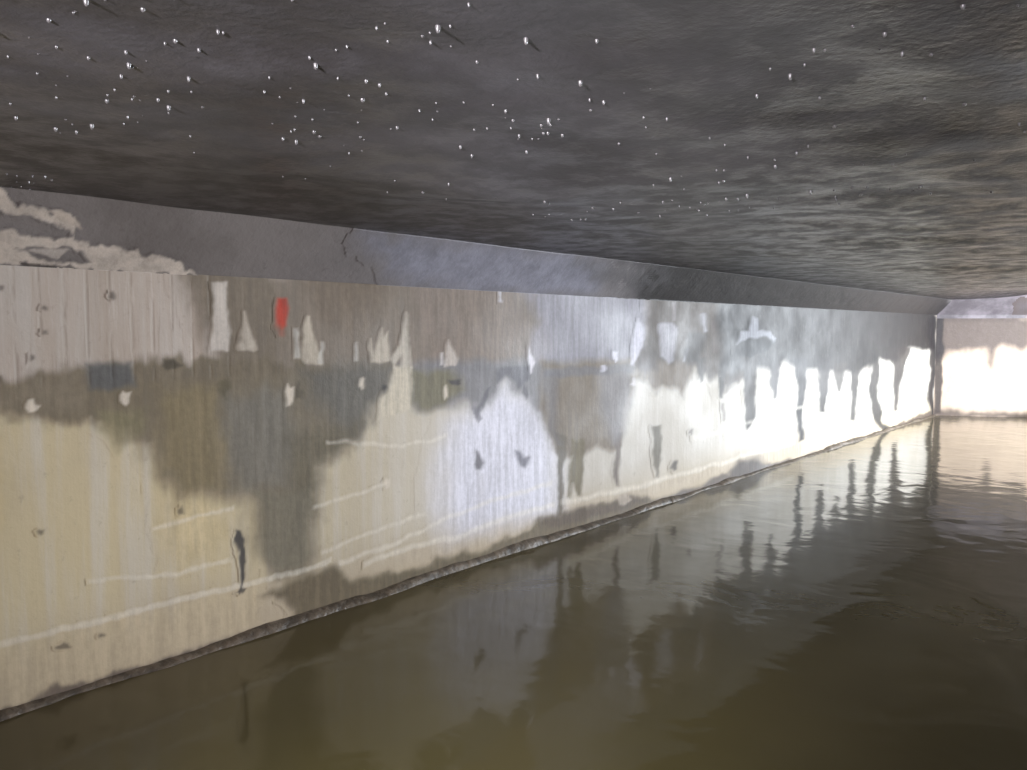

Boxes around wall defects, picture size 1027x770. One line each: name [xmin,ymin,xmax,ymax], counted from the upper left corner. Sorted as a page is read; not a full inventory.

peeling [0,187,198,275]
water stain [0,228,1027,710]